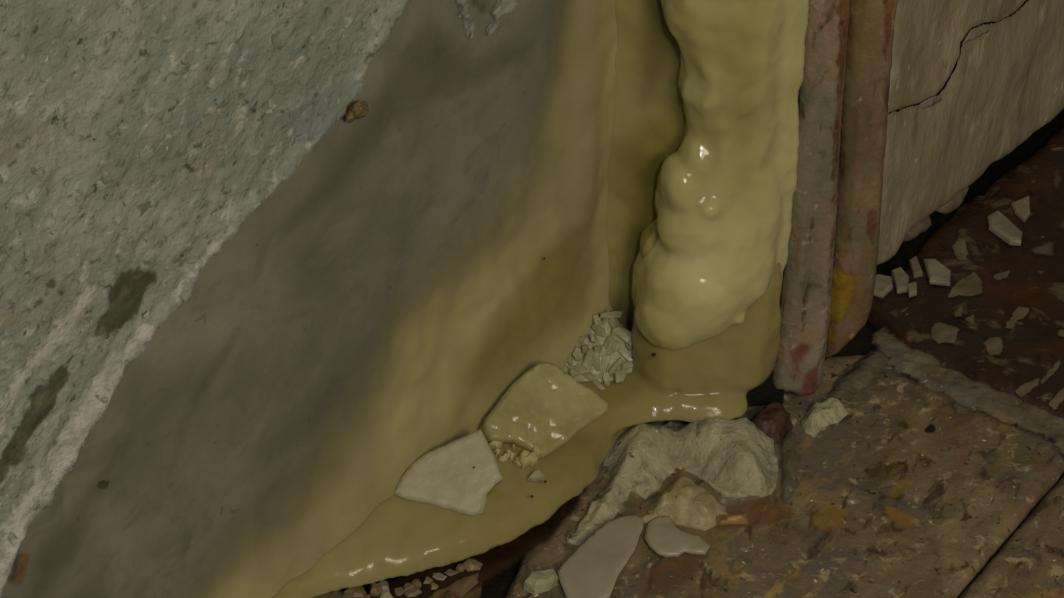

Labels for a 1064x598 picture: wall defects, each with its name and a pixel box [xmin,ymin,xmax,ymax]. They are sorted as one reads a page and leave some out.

flaking render [456,0,520,39]
corrosion [832,0,849,179]
crack [888,0,1029,114]
mould [96,267,157,336]
corrosion [826,267,856,343]
mould [0,365,69,483]